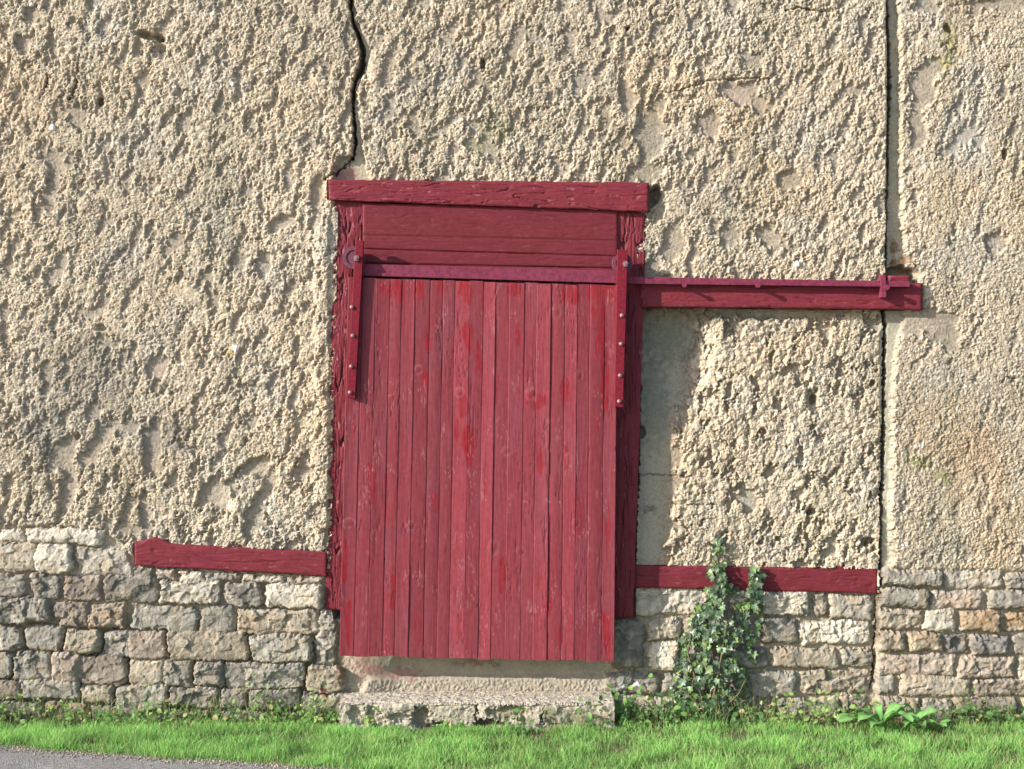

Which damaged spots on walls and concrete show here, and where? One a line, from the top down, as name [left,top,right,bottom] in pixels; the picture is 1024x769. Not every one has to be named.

crack [323,0,366,181]